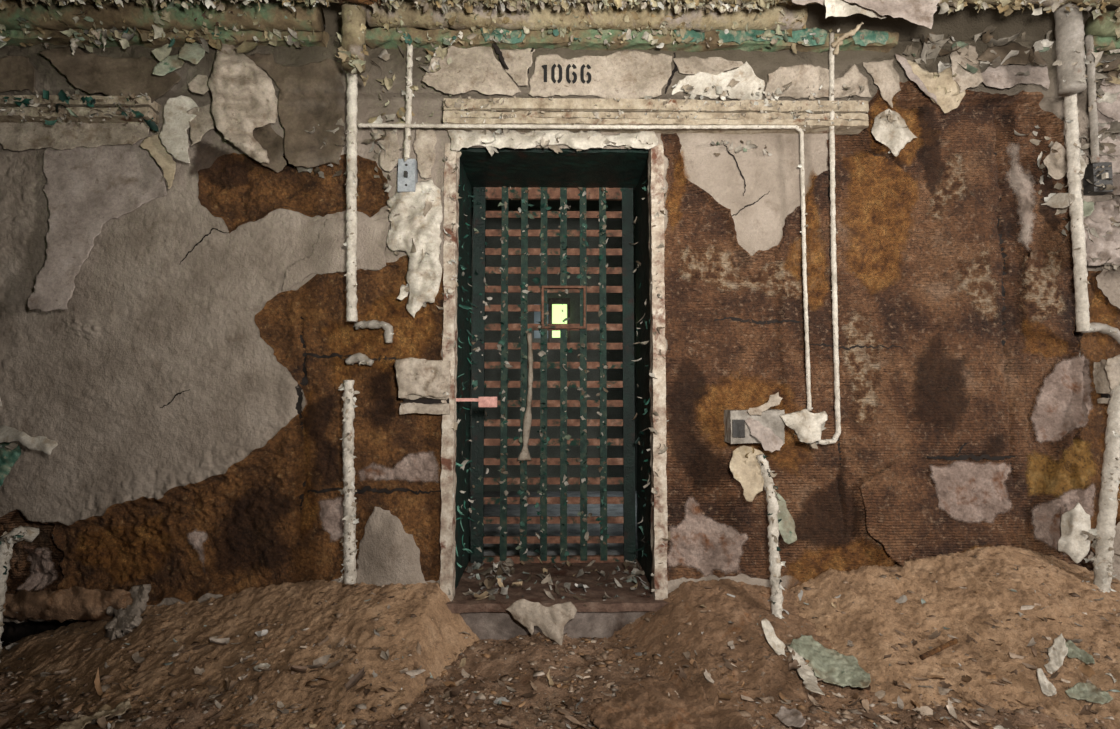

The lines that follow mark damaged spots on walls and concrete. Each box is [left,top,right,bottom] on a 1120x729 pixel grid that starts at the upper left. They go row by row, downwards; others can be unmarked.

spalling [0,0,492,605]
spalling [347,0,1120,604]
peeling [506,599,577,645]